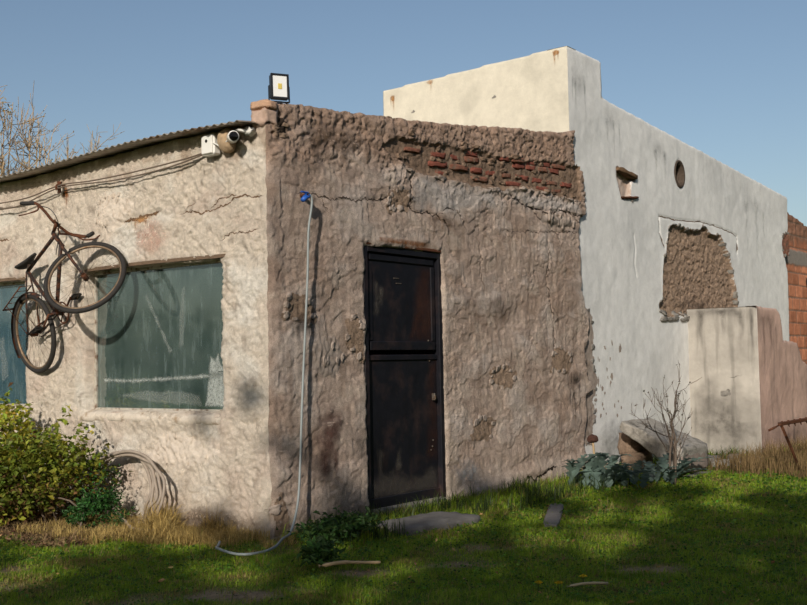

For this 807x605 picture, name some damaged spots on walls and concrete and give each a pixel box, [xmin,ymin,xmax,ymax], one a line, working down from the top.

spalling [382,129,582,202]
crack [125,211,159,223]
crack [183,194,262,215]
crack [296,177,467,230]
crack [507,194,583,346]
spalling [659,223,739,322]
peeling [584,308,622,446]
water stain [322,415,341,470]
crack [526,466,556,481]